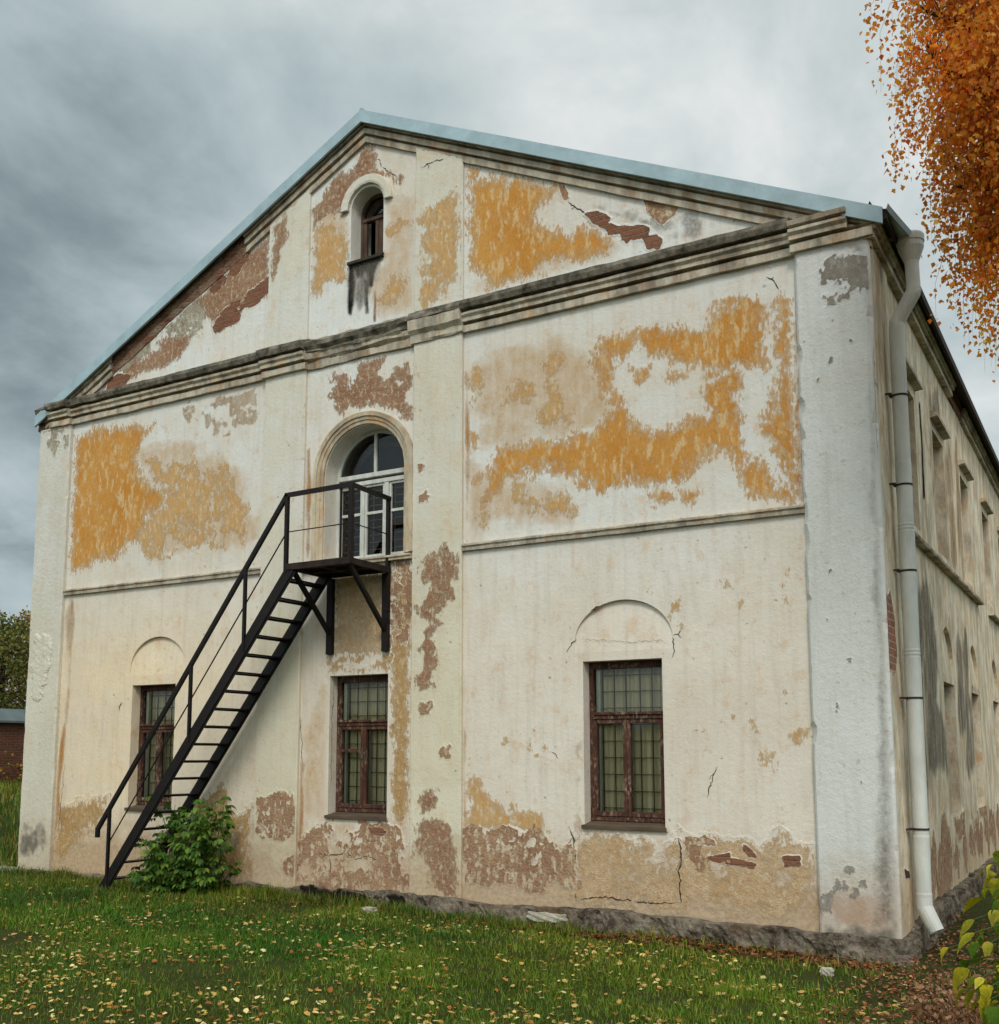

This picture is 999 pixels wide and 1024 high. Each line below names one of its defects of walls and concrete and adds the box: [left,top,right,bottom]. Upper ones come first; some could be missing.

spalling [100,216,289,391]
peeling [375,166,681,309]
spalling [327,355,414,421]
peeling [465,365,484,407]
peeling [471,291,803,530]
peeling [42,422,251,572]
peeling [188,542,869,924]
crack [575,838,682,904]